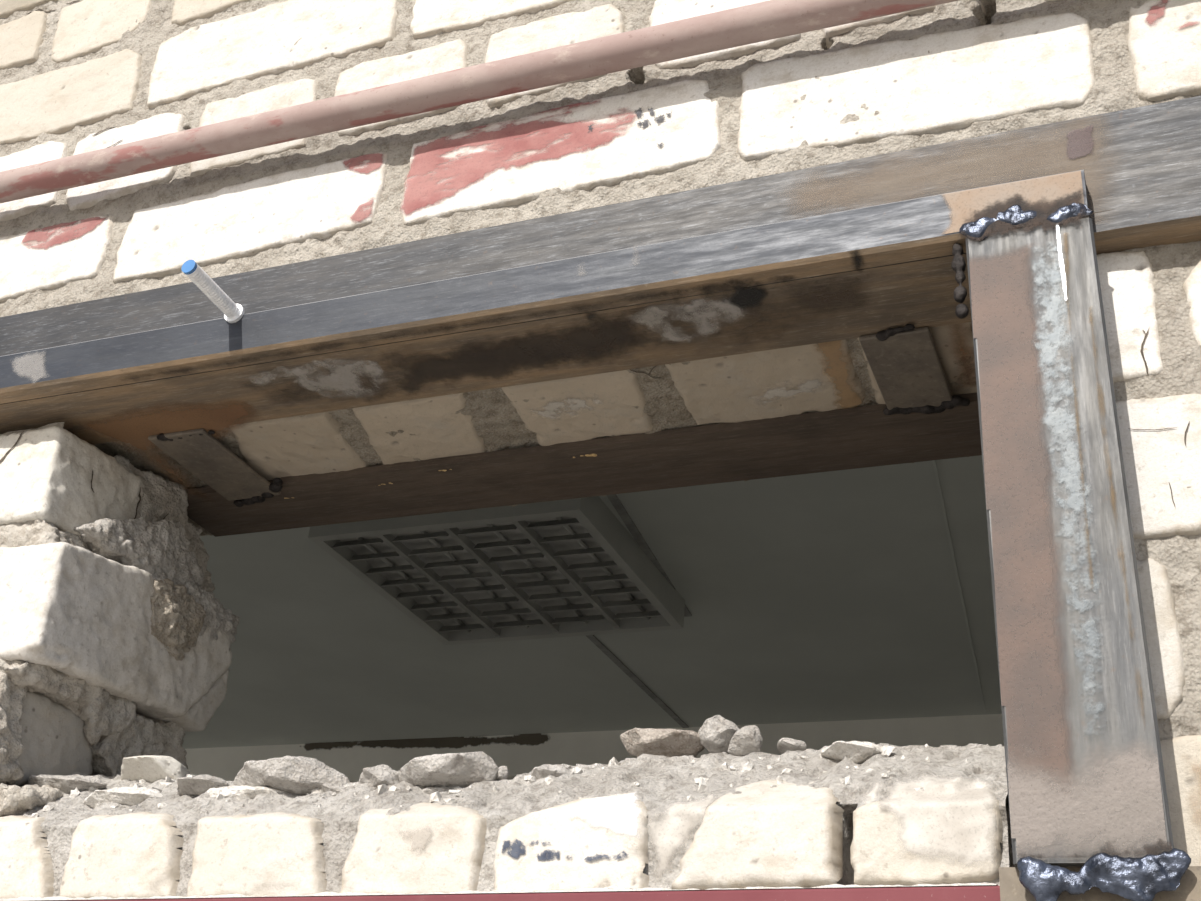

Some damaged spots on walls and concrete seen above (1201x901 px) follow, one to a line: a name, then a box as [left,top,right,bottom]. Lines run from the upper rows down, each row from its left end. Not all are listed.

crack [0,432,23,462]
rust [955,247,1071,791]